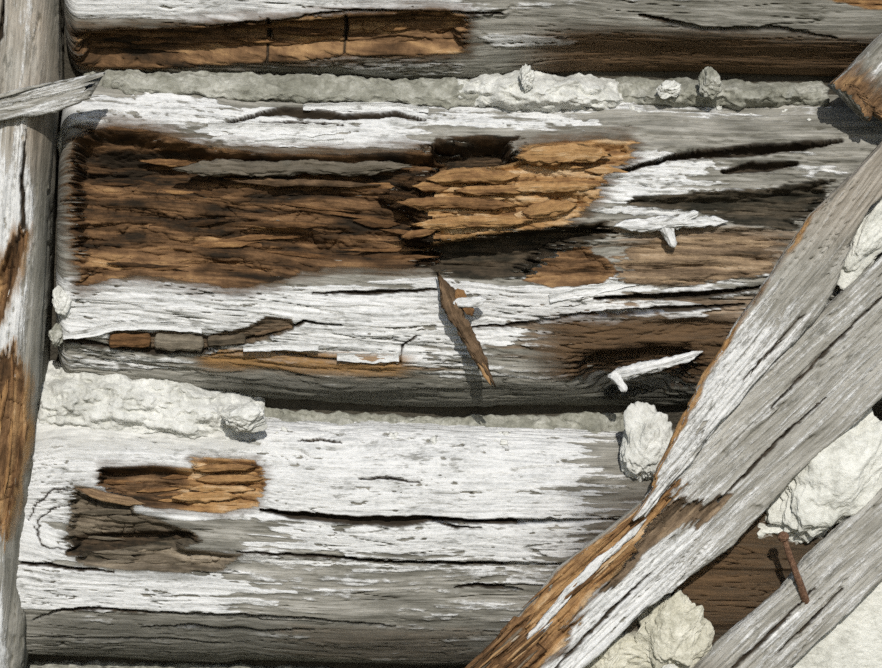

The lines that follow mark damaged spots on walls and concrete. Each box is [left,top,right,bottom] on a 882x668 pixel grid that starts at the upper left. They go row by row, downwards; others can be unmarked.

crack [0,0,8,40]
crack [621,139,843,174]
spalling [58,122,641,295]
crack [312,288,437,296]
crack [294,319,341,327]
crack [63,338,215,355]
spalling [62,457,271,573]
crack [260,509,518,529]